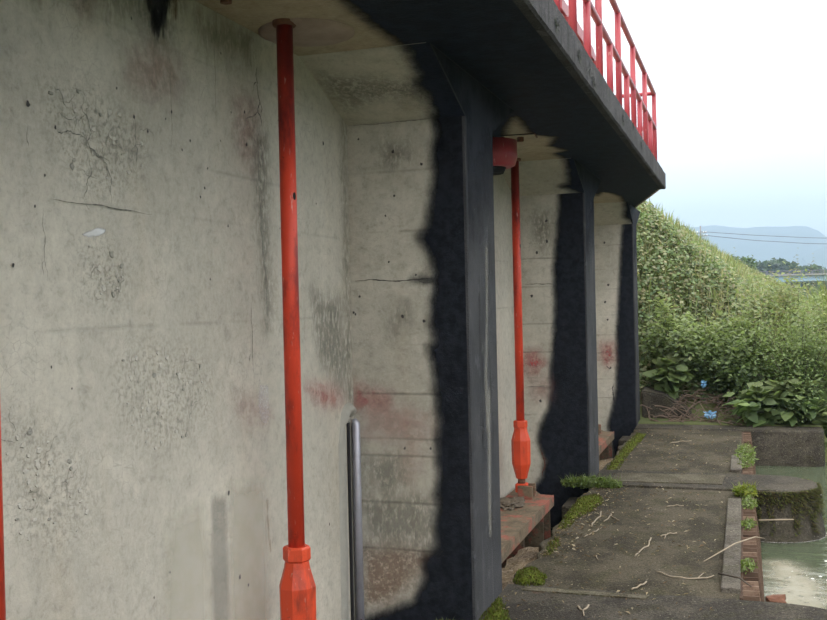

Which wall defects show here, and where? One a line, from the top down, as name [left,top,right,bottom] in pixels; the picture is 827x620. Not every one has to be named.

damp [146,0,170,36]
crack [53,87,152,215]
crack [360,276,431,284]
damp [340,0,660,620]